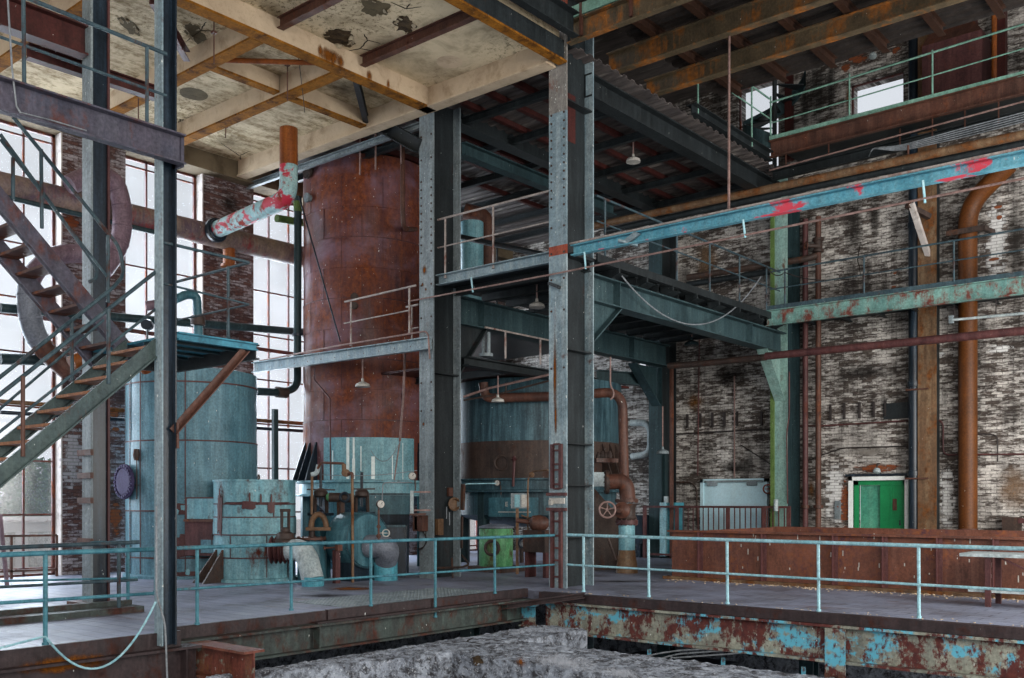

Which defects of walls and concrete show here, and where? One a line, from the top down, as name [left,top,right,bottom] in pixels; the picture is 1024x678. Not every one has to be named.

flaking render [117,16,140,36]
flaking render [183,23,207,44]
spalling [322,29,356,49]
spalling [361,0,417,34]